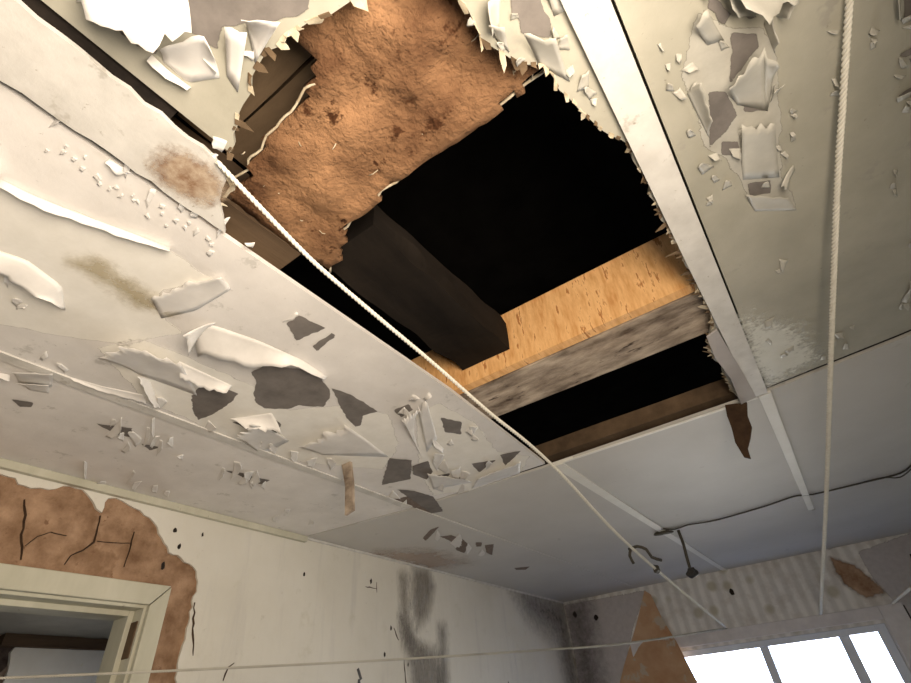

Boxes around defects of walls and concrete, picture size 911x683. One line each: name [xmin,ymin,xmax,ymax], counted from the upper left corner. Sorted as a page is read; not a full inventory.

peeling [76,0,309,92]
peeling [488,0,598,106]
peeling [208,136,227,157]
peeling [665,0,799,211]
peeling [59,145,230,257]
peeling [0,179,530,513]
peeling [739,316,826,385]
crack [20,499,135,567]
spalling [0,475,197,683]
leakage [416,572,432,618]
peeling [423,527,494,556]
leakage [405,623,445,683]